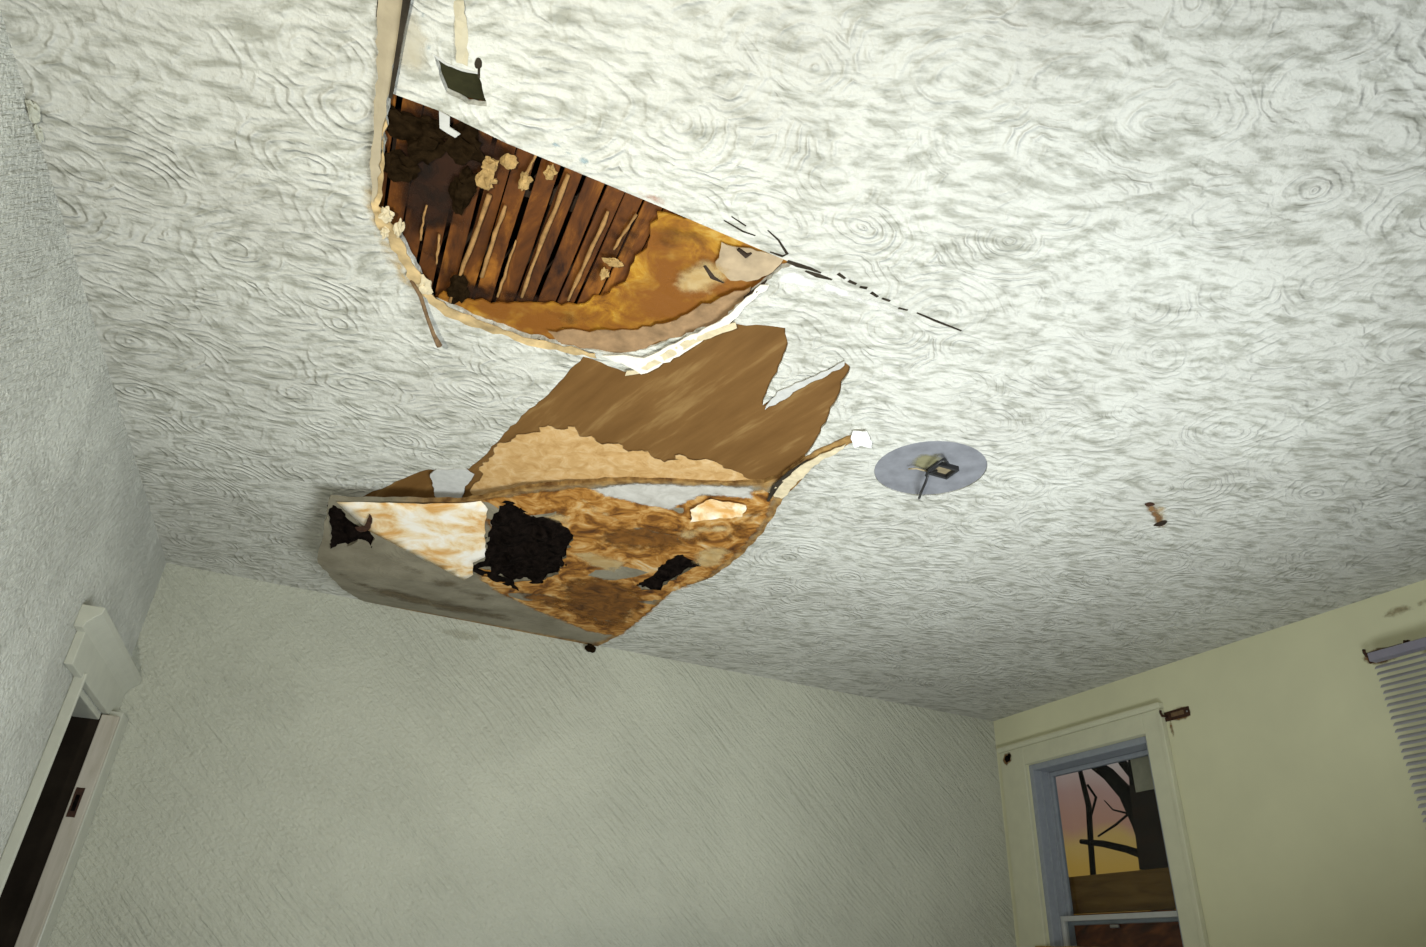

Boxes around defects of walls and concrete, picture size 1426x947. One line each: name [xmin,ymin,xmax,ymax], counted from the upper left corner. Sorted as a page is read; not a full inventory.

peeling [453,0,482,78]
peeling [370,0,411,203]
crack [724,216,962,331]
peeling [363,306,850,498]
peeling [851,431,872,448]
damp [361,584,502,619]
damp [480,487,774,636]